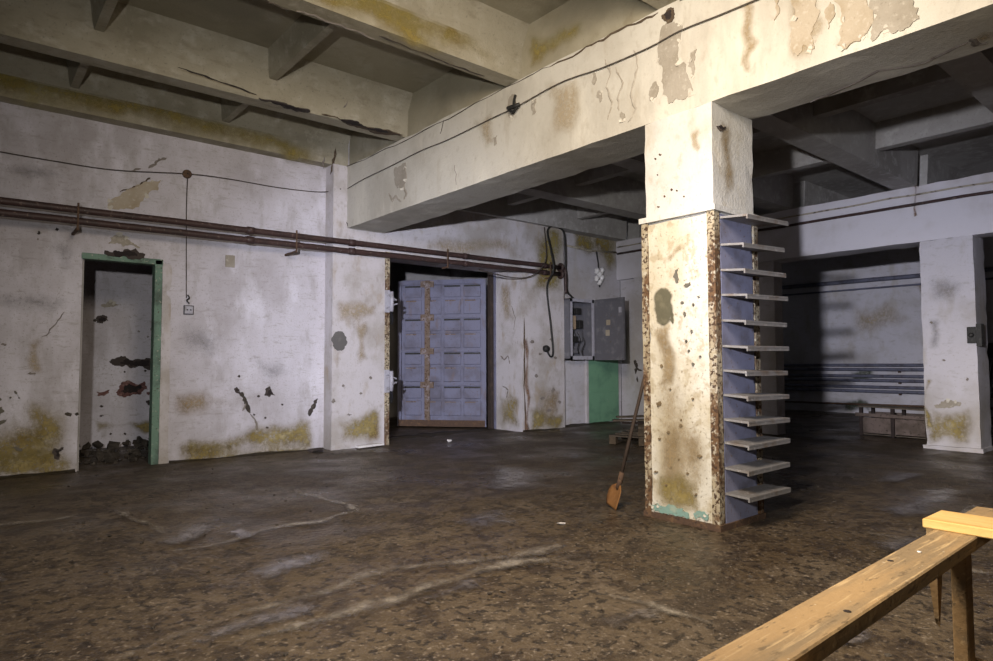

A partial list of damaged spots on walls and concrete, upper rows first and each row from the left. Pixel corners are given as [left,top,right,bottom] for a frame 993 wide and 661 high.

peeling [649,7,697,104]
peeling [774,0,920,56]
peeling [107,177,161,210]
leakage [658,311,674,381]
leakage [0,409,68,474]
spalling [97,356,150,417]
leakage [187,424,310,460]
leakage [503,400,517,423]
leakage [660,394,697,506]